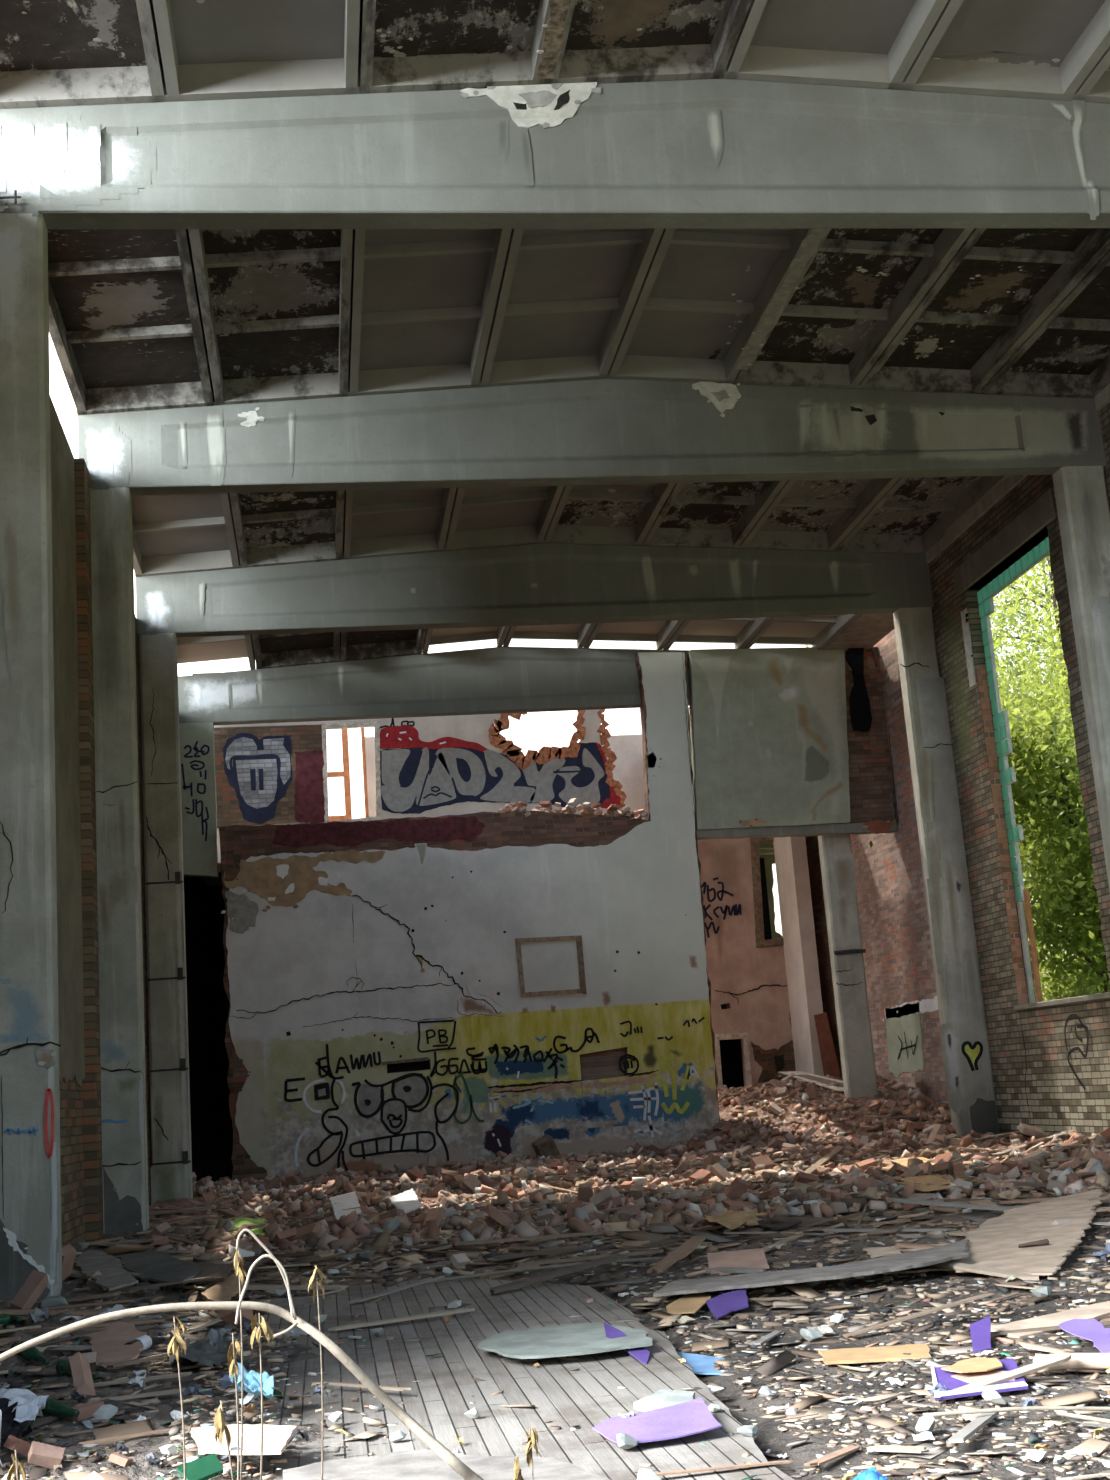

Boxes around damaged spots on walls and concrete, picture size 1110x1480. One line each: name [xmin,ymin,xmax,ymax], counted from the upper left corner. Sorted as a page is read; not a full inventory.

peeling [460,0,703,129]
spalling [692,229,830,418]
spalling [488,709,627,807]
crack [0,821,14,912]
peeling [211,849,386,934]
crack [229,895,504,1027]
crack [0,1037,61,1219]